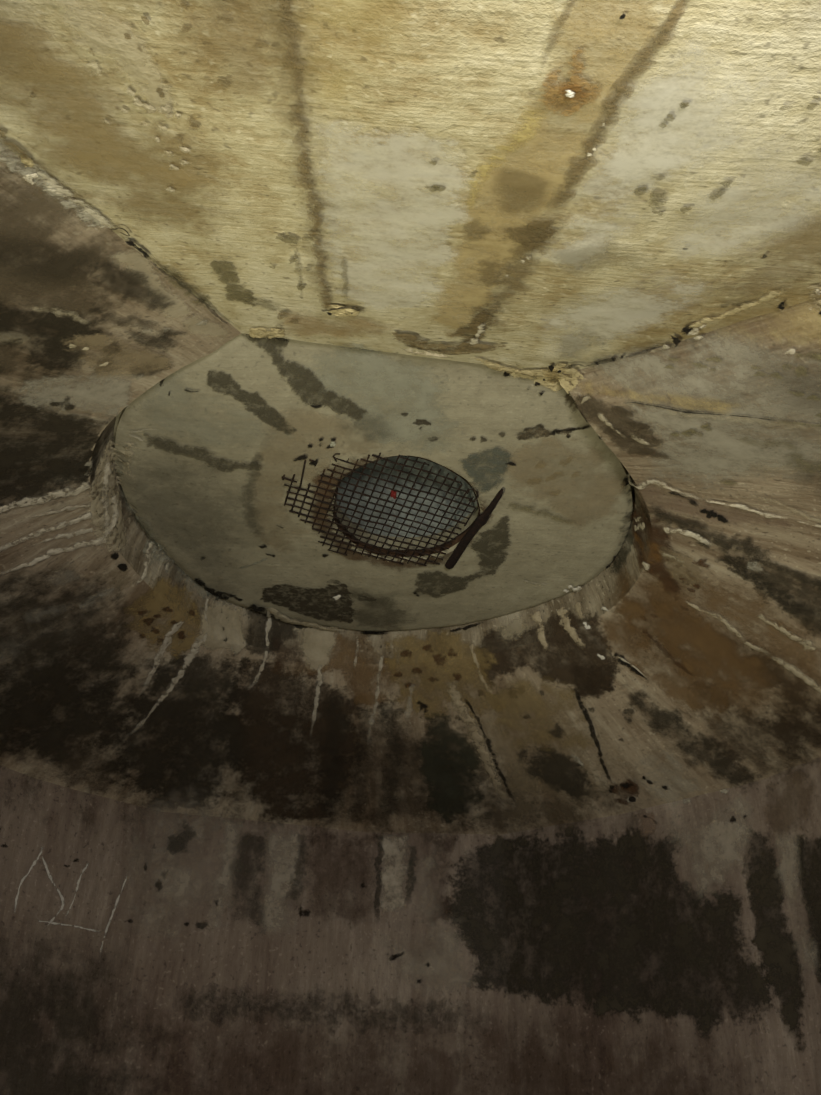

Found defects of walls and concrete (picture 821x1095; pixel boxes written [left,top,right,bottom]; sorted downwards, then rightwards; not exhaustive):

damp [276,0,464,309]
rust [434,118,588,336]
rust [542,50,631,119]
damp [556,0,732,216]
damp [0,130,226,513]
damp [207,371,296,434]
spalling [294,438,336,465]
damp [246,335,451,448]
crack [569,292,781,369]
damp [565,338,821,485]
damp [0,505,821,1050]
crack [575,691,610,779]